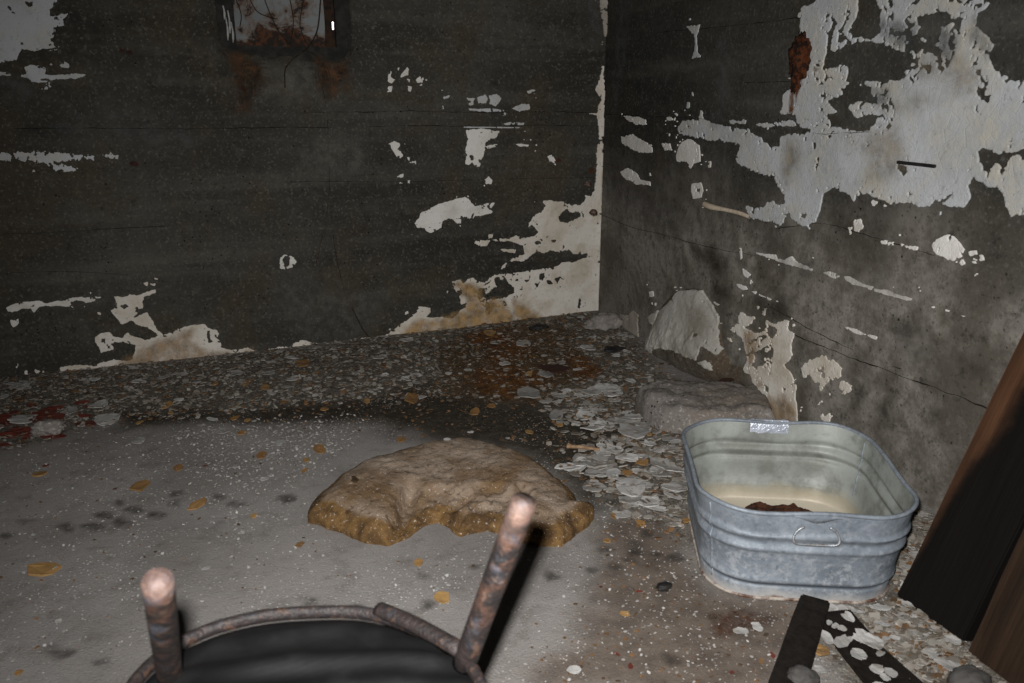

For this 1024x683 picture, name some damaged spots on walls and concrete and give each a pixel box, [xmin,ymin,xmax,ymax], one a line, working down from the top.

peeling [0,0,86,90]
corrosion [789,73,801,113]
peeling [621,0,1024,229]
peeling [848,219,864,235]
peeling [6,278,318,397]
peeling [380,66,852,517]
crack [769,306,987,409]